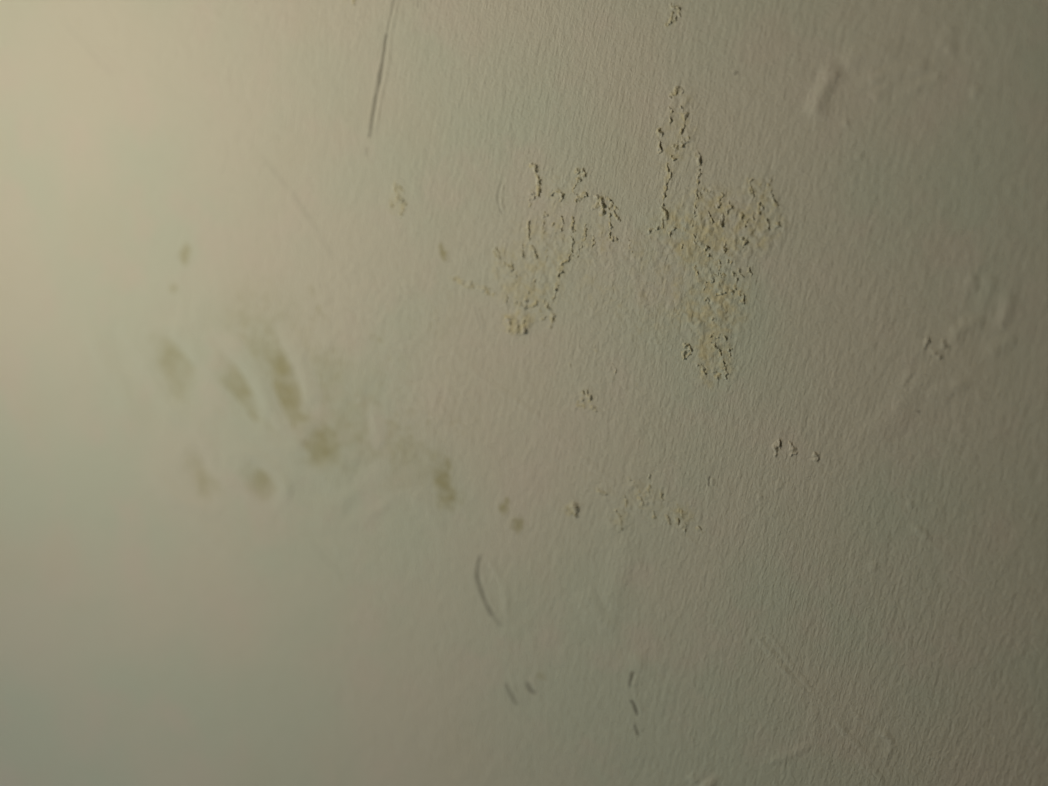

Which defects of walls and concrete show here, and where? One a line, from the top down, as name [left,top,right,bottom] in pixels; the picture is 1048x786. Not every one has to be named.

flaking render [617,76,794,394]
leakage [213,355,279,436]
leakage [244,326,354,476]
leakage [178,439,279,514]
leakage [425,453,471,519]